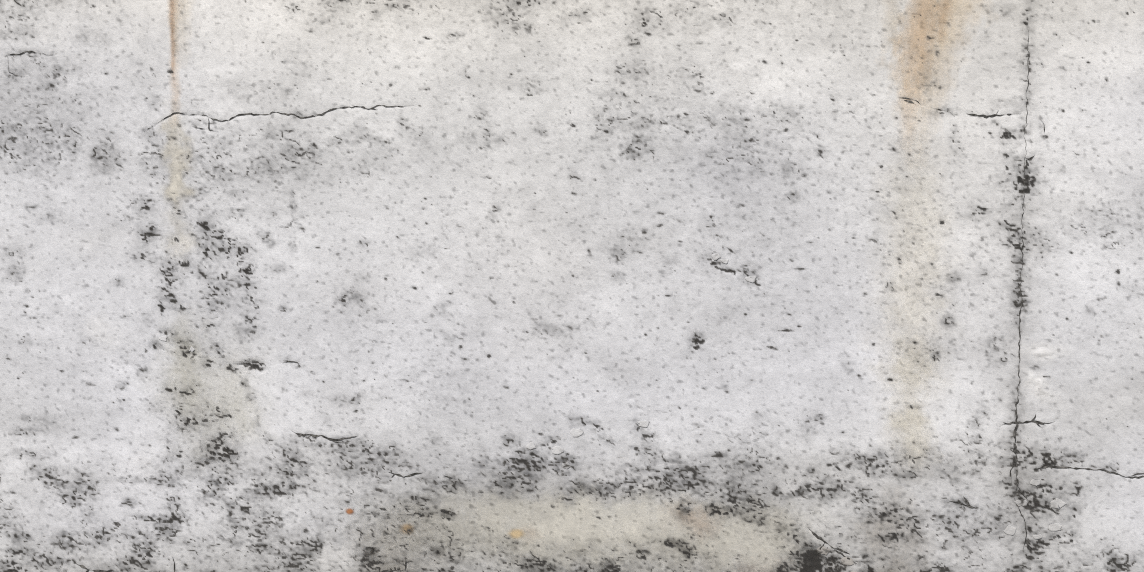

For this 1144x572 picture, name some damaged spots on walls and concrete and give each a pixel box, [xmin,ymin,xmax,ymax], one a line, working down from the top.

crack [144,105,410,132]
crack [899,37,1144,549]
water stain [410,494,823,572]